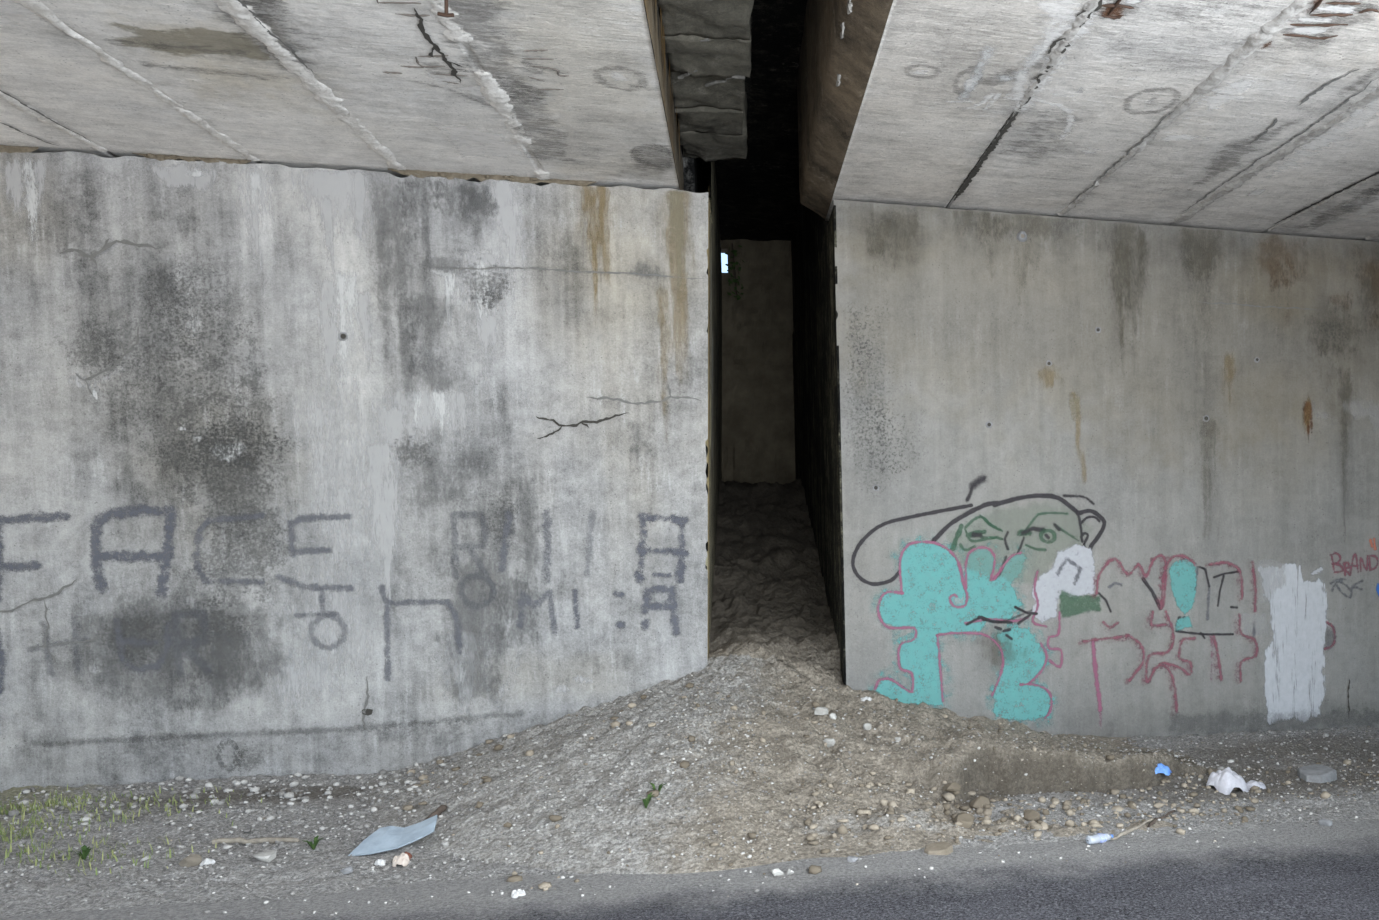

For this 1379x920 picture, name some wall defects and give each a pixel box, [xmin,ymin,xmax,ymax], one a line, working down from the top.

crack [954,0,1102,201]
spalling [0,145,39,153]
crack [1067,102,1184,207]
crack [1185,69,1379,211]
crack [1275,171,1379,224]
crack [536,385,701,439]
rust [1303,401,1313,440]